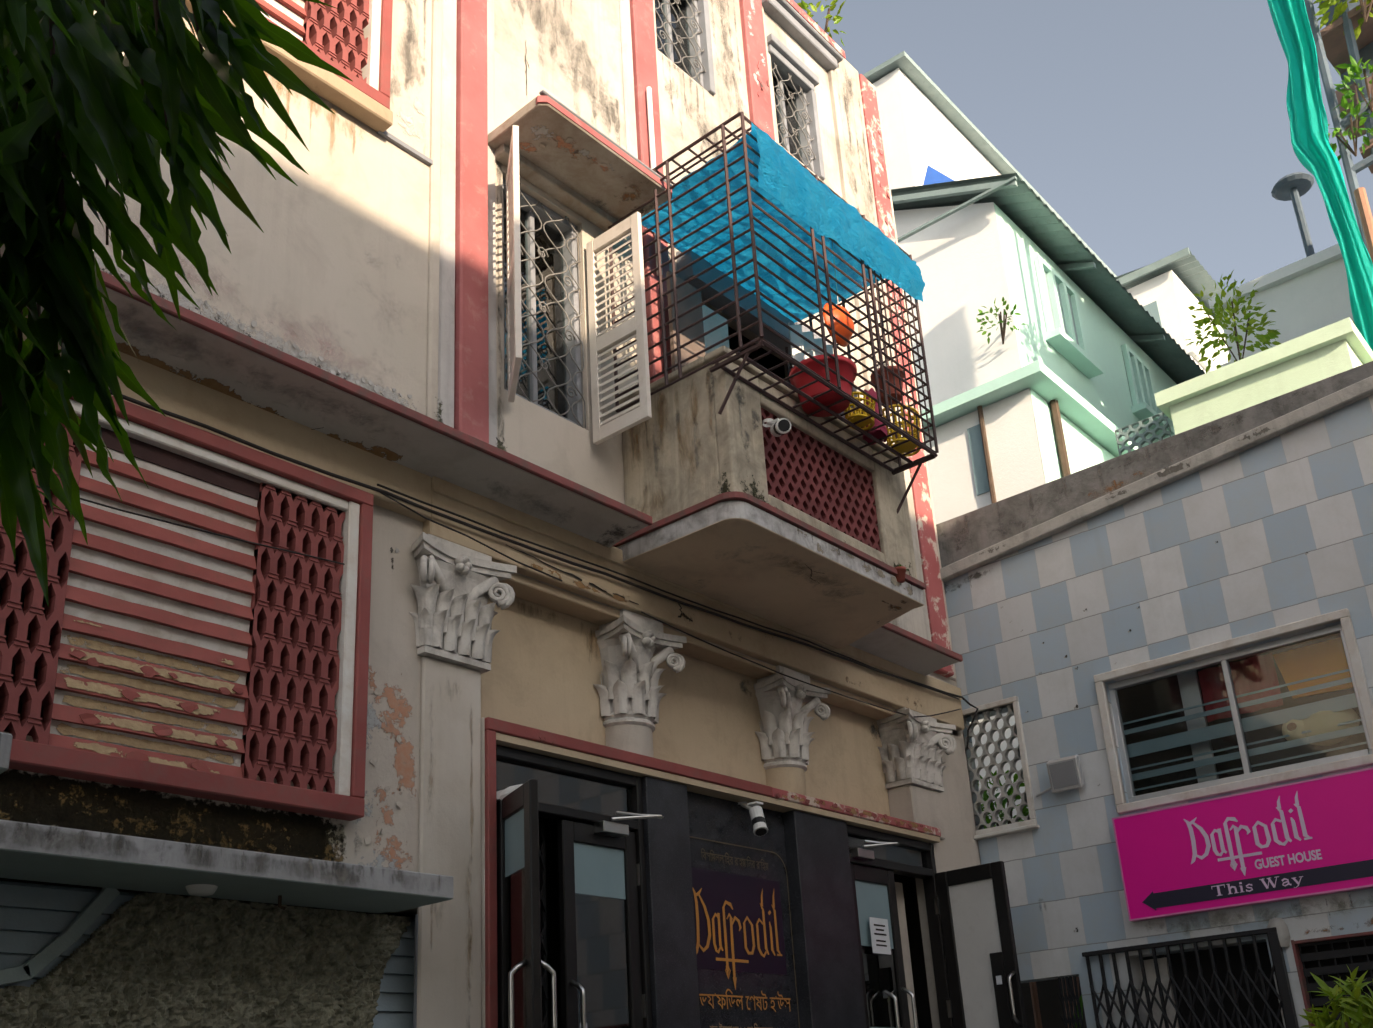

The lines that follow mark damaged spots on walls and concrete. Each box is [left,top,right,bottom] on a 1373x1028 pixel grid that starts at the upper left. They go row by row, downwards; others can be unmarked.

leakage [521,0,620,127]
peeling [871,119,896,243]
peeling [56,620,243,774]
peeling [357,665,416,870]